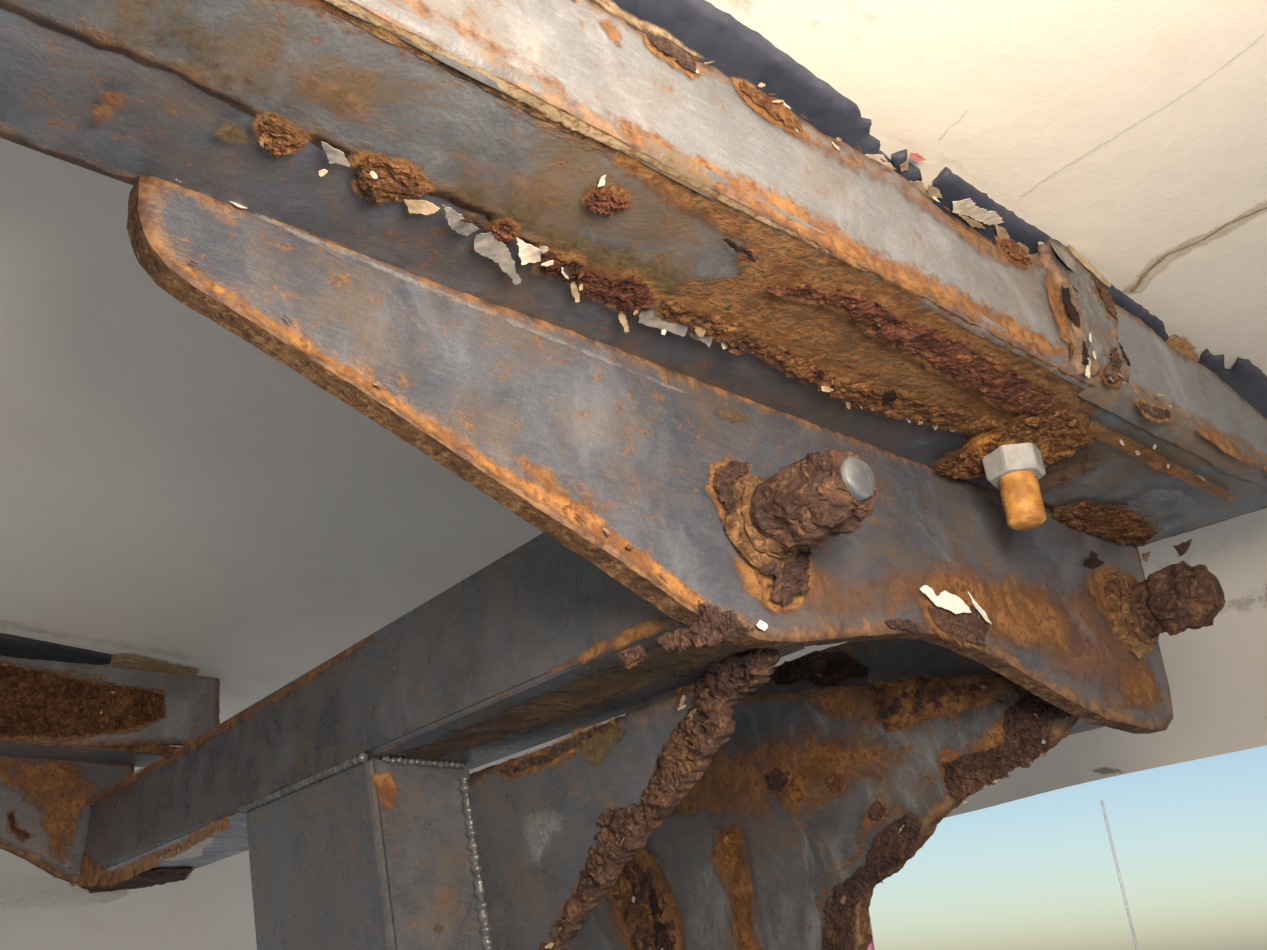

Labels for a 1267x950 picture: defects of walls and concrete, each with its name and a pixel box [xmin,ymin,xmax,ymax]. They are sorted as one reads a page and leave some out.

rust [455,22,506,54]
peeling [866,152,1004,229]
spalling [474,231,689,336]
rust [217,112,1235,501]
crack [1131,207,1267,292]
rust [1197,428,1267,472]
rust [158,246,1072,950]
rust [735,500,1160,710]
peeling [920,585,992,624]
rust [0,635,374,893]